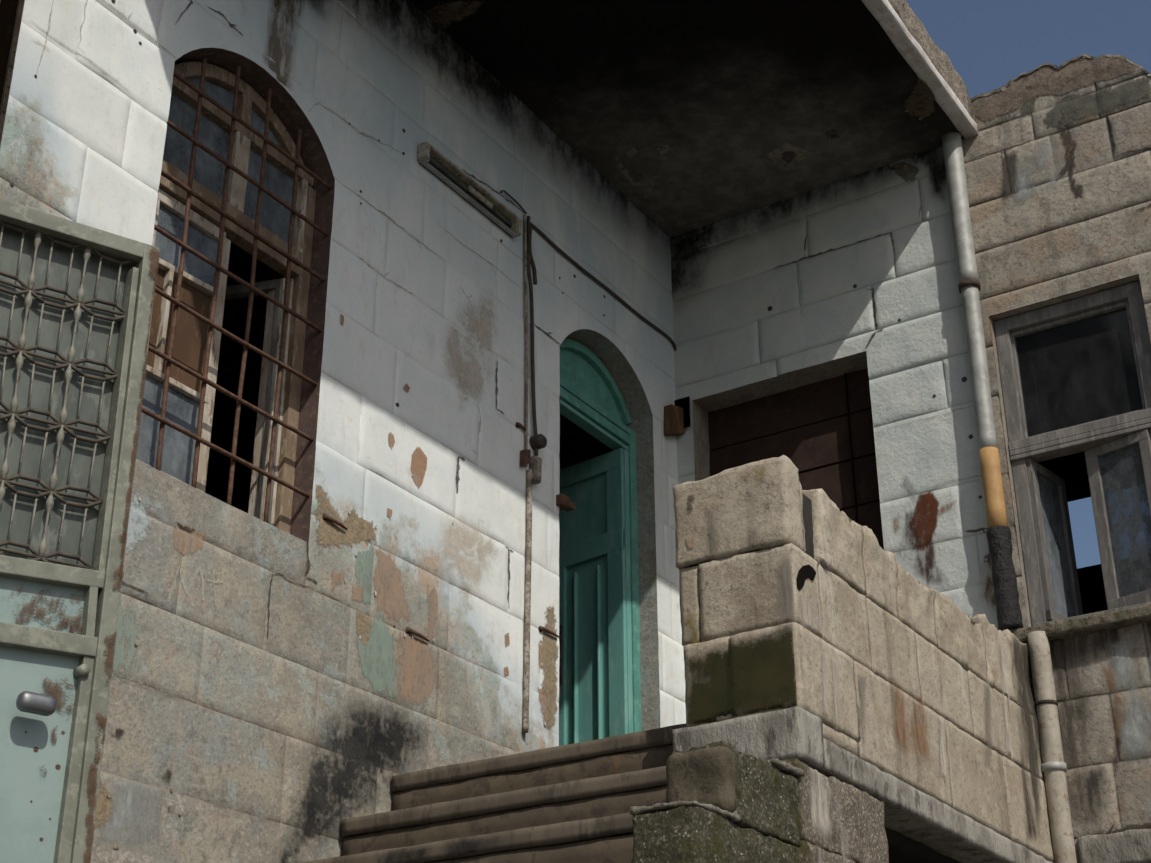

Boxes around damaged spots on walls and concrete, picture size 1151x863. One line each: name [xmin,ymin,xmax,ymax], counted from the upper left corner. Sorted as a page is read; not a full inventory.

crack [175,0,243,36]
water stain [268,0,302,86]
peeling [411,447,427,488]
flaking render [445,520,492,580]
corrosion [894,478,951,581]
peeling [538,606,559,729]
spalling [94,780,115,829]
water stain [282,711,425,863]